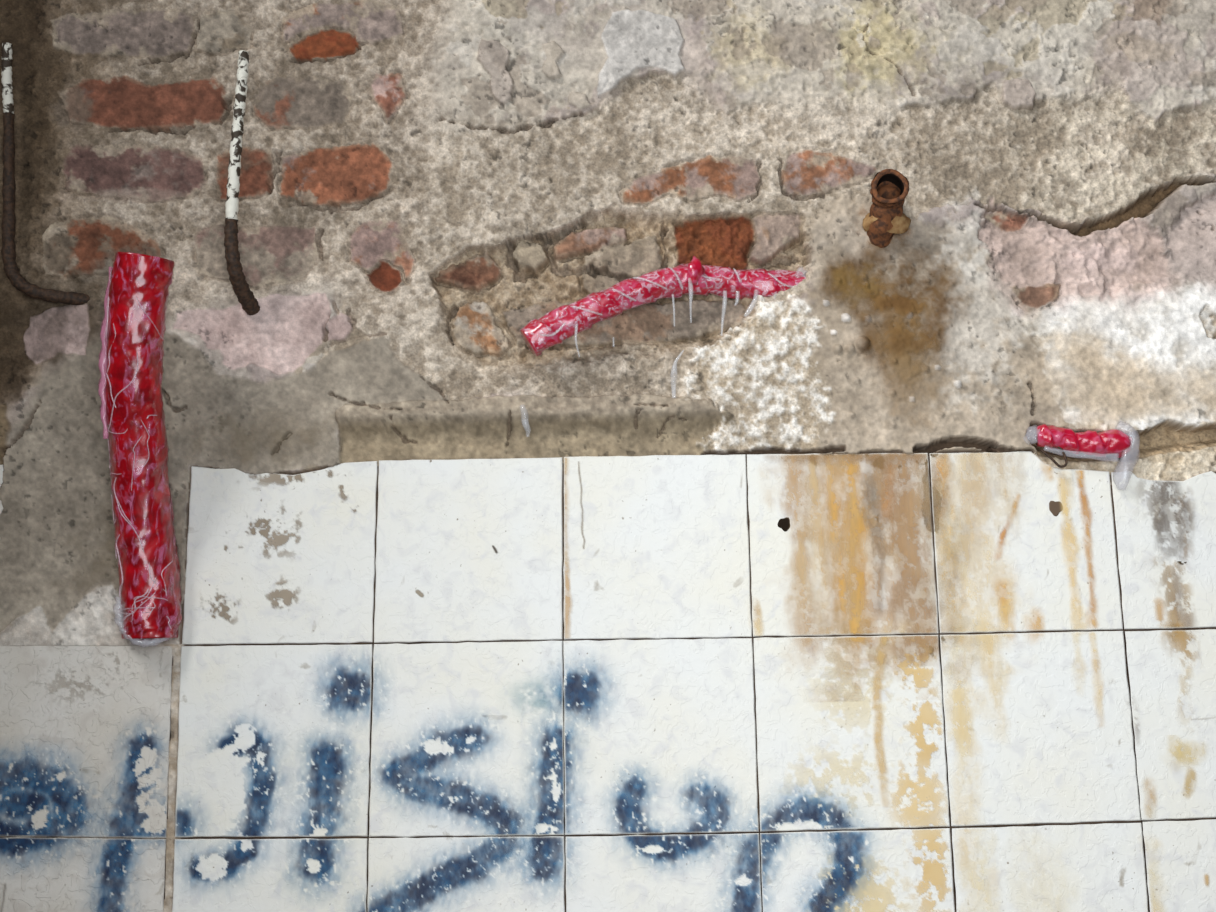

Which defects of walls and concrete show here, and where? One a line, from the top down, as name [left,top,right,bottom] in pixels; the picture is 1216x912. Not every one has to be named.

spalling [0,0,1216,405]
rust [826,246,953,380]
rust [787,454,946,658]
rust [1000,585,1010,623]
rust [1062,471,1093,577]
rust [1174,744,1194,793]